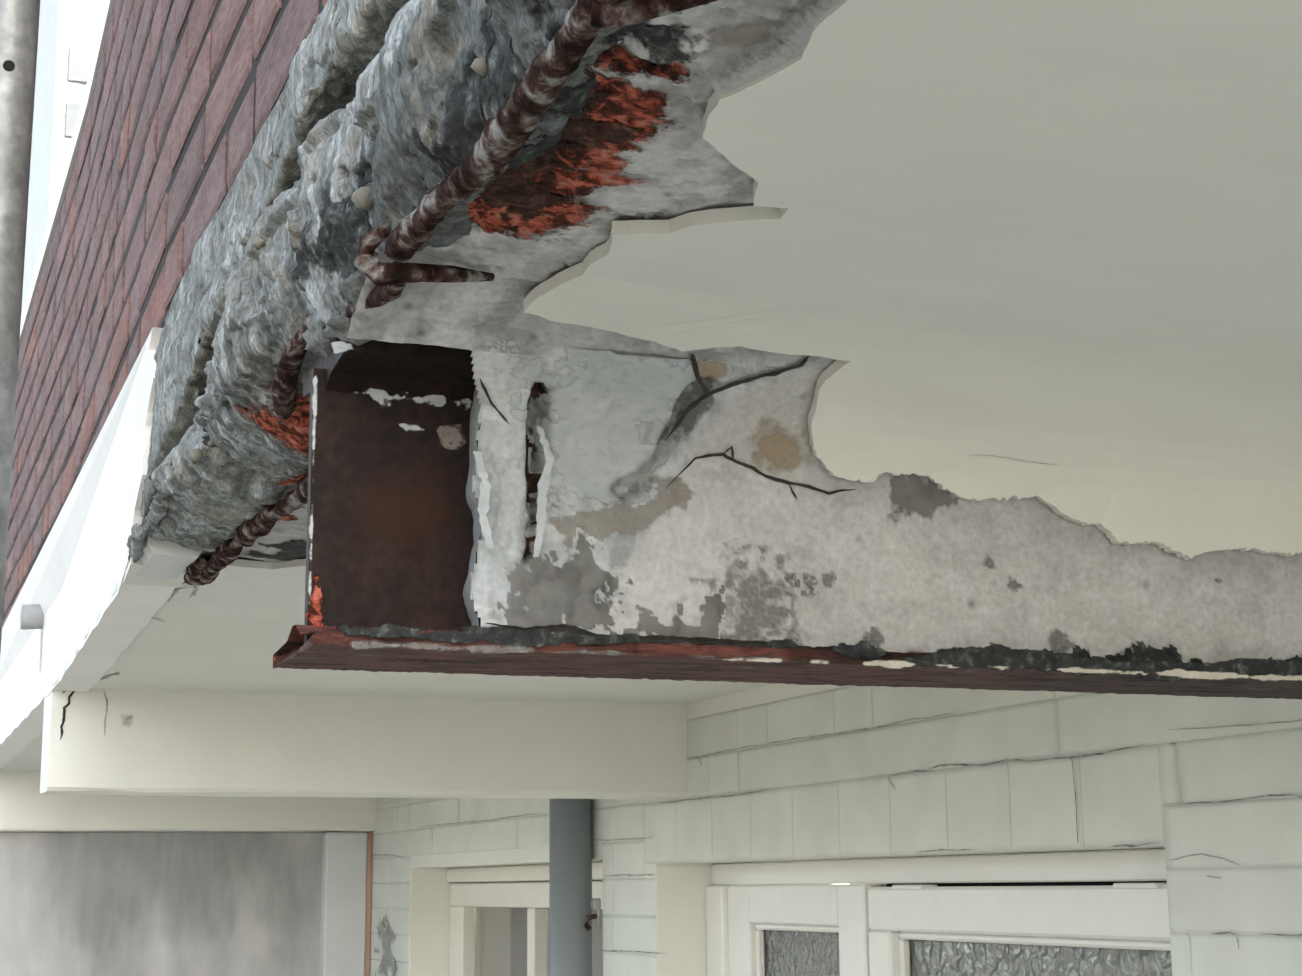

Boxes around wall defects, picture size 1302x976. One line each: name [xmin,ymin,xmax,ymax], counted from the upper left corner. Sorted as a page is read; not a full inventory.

rust [466,45,690,241]
spalling [127,0,1302,663]
crack [665,354,810,441]
rust [234,386,310,521]
rust [524,382,547,557]
damp [497,361,726,645]
crack [666,446,855,499]
damp [891,473,957,521]
rust [305,575,641,655]
rust [831,641,1302,682]
crack [60,673,120,740]
crack [1212,932,1302,949]